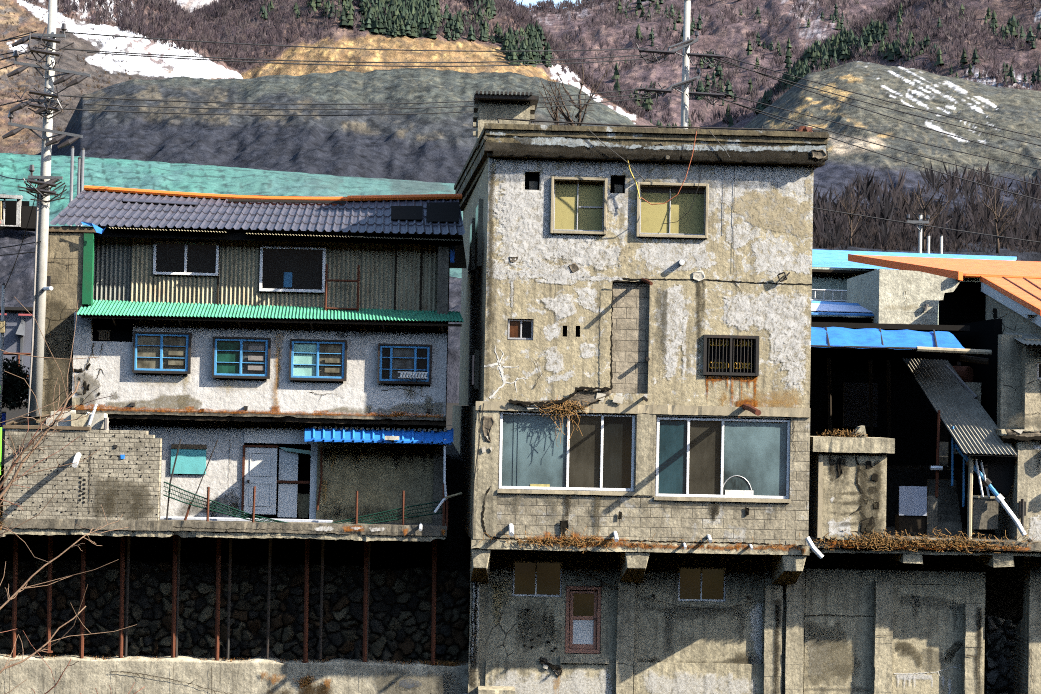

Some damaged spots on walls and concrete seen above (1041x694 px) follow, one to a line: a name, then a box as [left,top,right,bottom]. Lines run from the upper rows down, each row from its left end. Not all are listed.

peeling [490,132,827,274]
peeling [488,160,717,383]
peeling [723,290,810,390]
peeling [46,363,117,430]
spalling [511,389,624,409]
crack [476,271,812,540]
corrosion [706,375,797,417]
crack [1002,380,1041,446]
crack [596,457,1039,552]
crack [539,656,562,676]
damp [805,622,869,694]
damp [897,642,963,694]